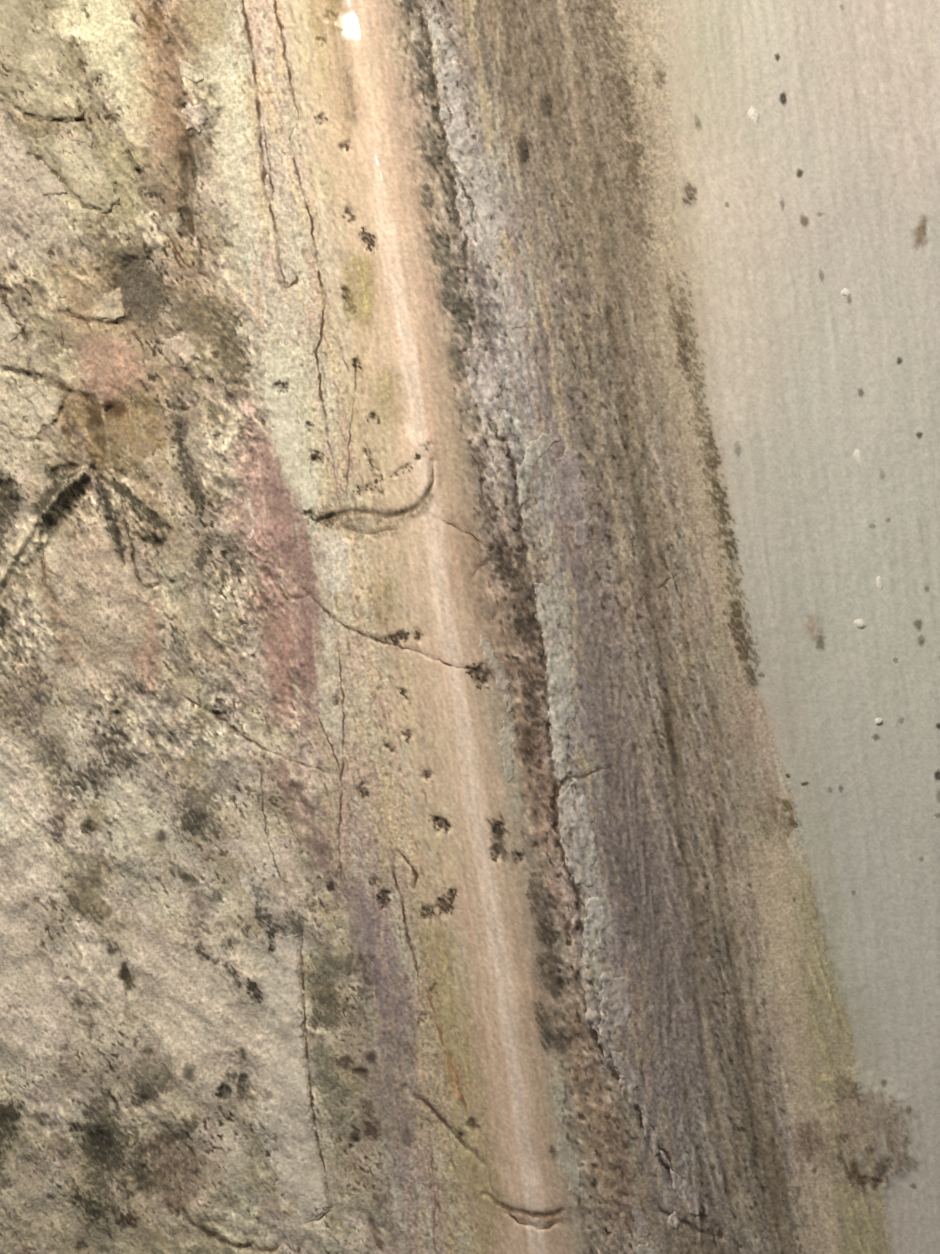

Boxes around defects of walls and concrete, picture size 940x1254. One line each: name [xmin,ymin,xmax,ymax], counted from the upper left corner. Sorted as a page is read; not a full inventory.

crack [415,3,475,257]
crack [242,0,356,482]
crack [332,469,433,534]
crack [272,566,409,649]
crack [185,697,279,873]
crack [299,661,345,825]